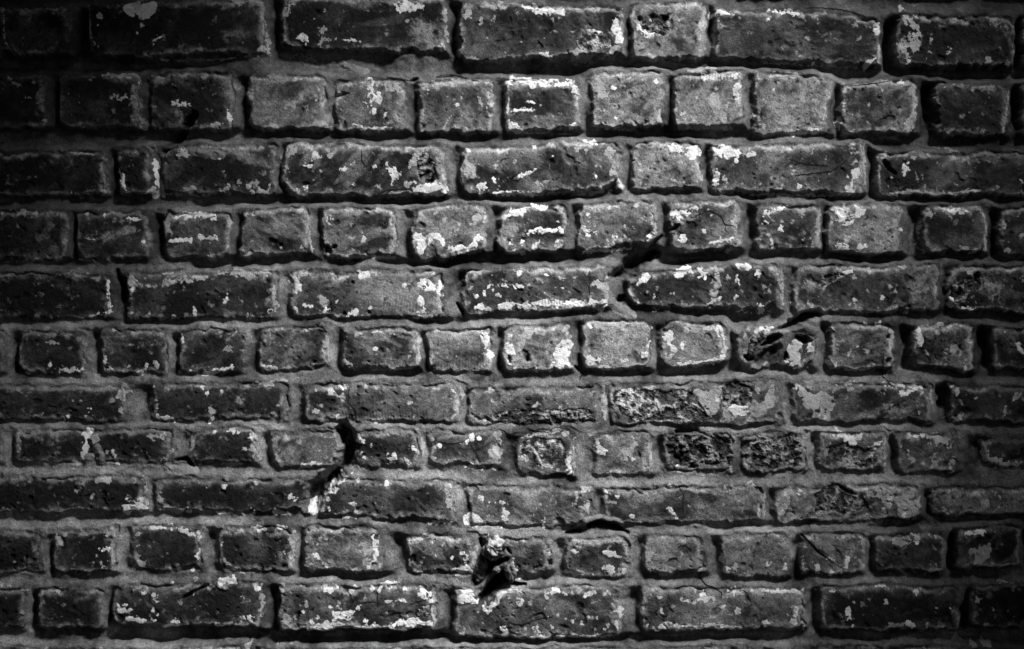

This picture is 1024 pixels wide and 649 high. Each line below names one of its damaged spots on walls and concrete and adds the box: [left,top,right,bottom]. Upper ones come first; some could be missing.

peeling [670,206,699,221]
spalling [459,210,938,600]
crack [801,534,845,570]
peeling [888,602,951,629]